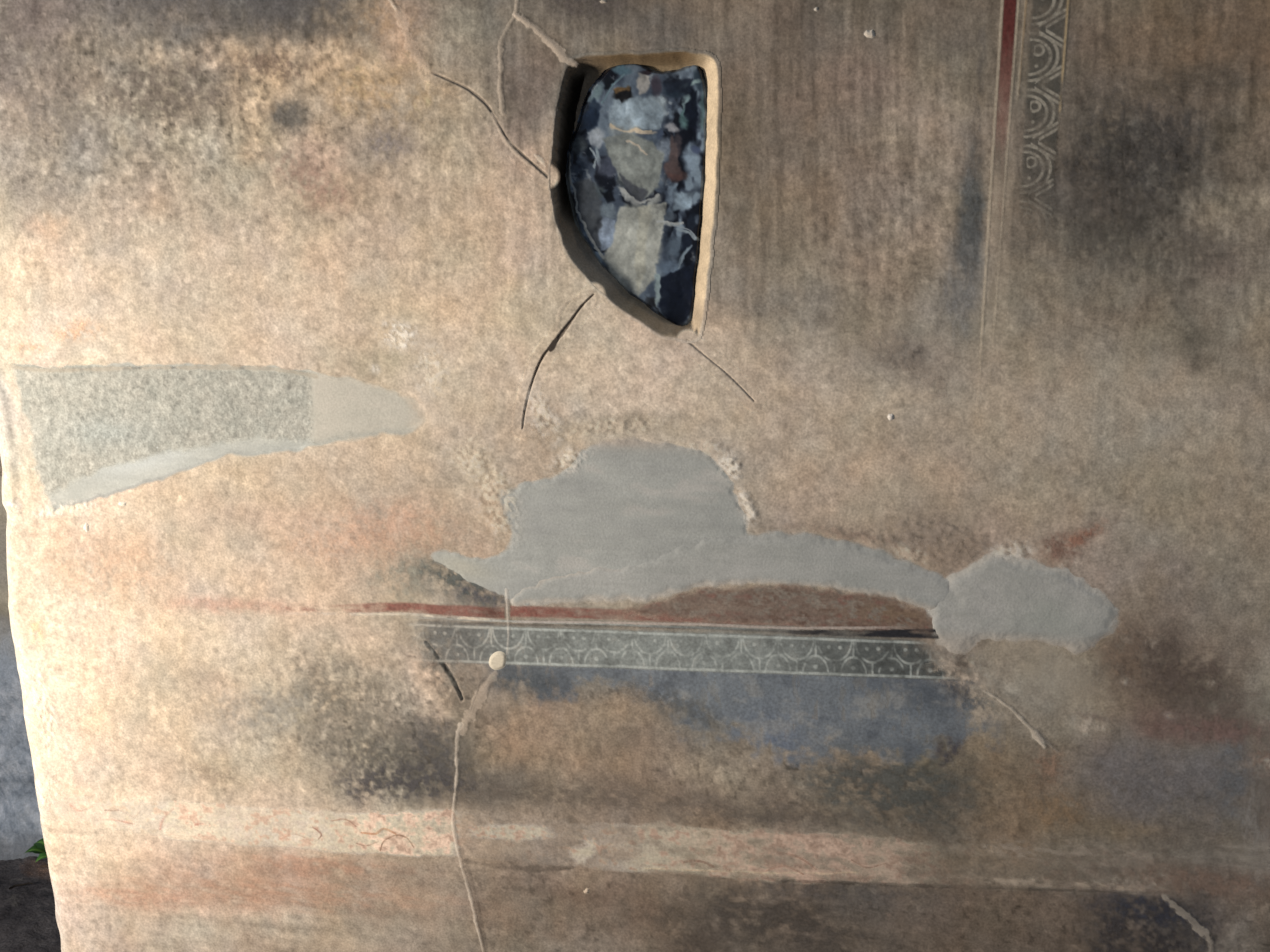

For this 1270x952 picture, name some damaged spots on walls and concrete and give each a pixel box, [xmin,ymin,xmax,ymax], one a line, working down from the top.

crack [421,62,558,187]
spalling [548,48,722,343]
crack [512,284,604,439]
spalling [719,457,739,479]
spalling [739,493,754,521]
crack [415,632,473,730]
crack [450,764,458,844]
crack [1162,895,1211,942]